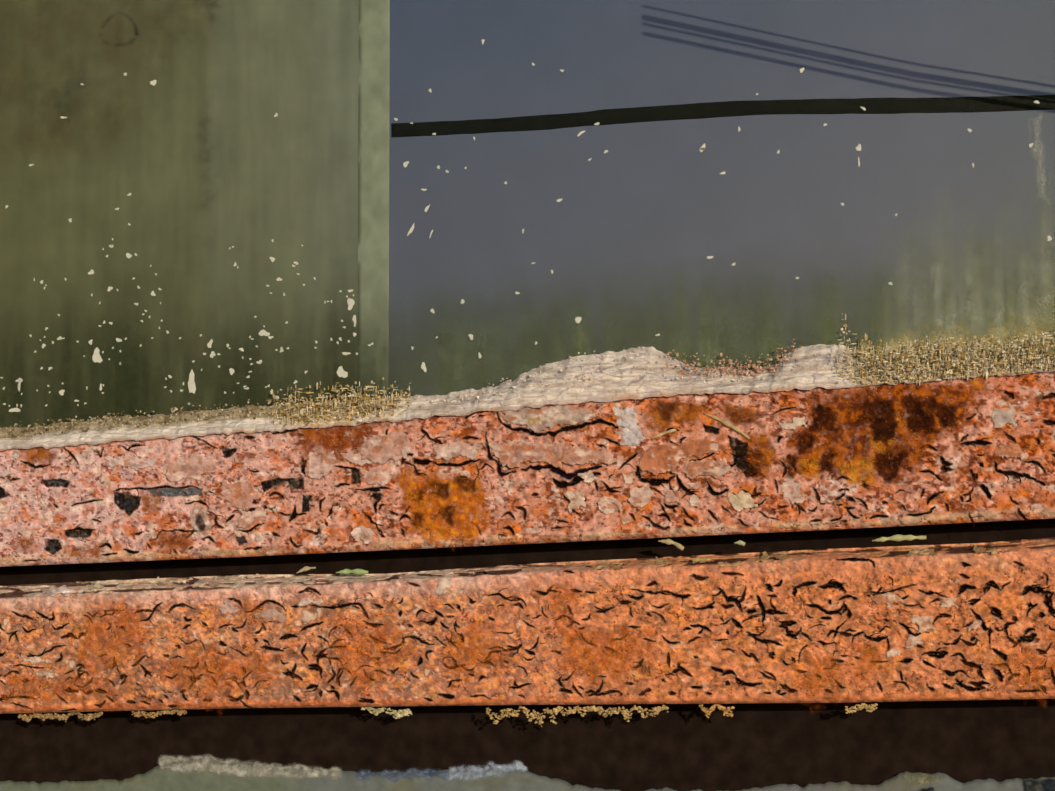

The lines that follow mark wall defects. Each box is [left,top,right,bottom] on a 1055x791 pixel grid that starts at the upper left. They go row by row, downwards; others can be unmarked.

leakage [439,332,566,394]
leakage [641,328,663,352]
leakage [700,325,776,370]
leakage [853,298,1055,373]
rust [20,448,54,465]
crack [10,443,145,481]
rust [303,422,377,460]
crack [53,393,1055,556]
rust [646,401,700,431]
rust [726,376,986,484]
rust [398,470,489,543]
crack [0,557,1055,711]